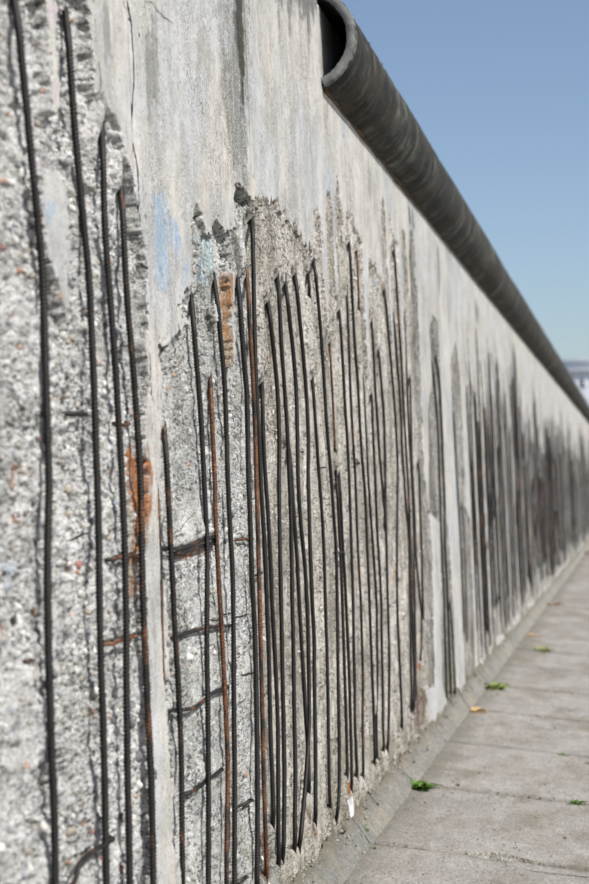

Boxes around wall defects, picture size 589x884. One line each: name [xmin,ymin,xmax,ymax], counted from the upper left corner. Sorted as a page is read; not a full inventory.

crack [123,0,135,115]
leakage [220,0,250,206]
leakage [281,0,317,34]
crack [133,144,141,226]
spalling [0,0,157,884]
corrosion [126,445,153,596]
spalling [158,175,588,884]